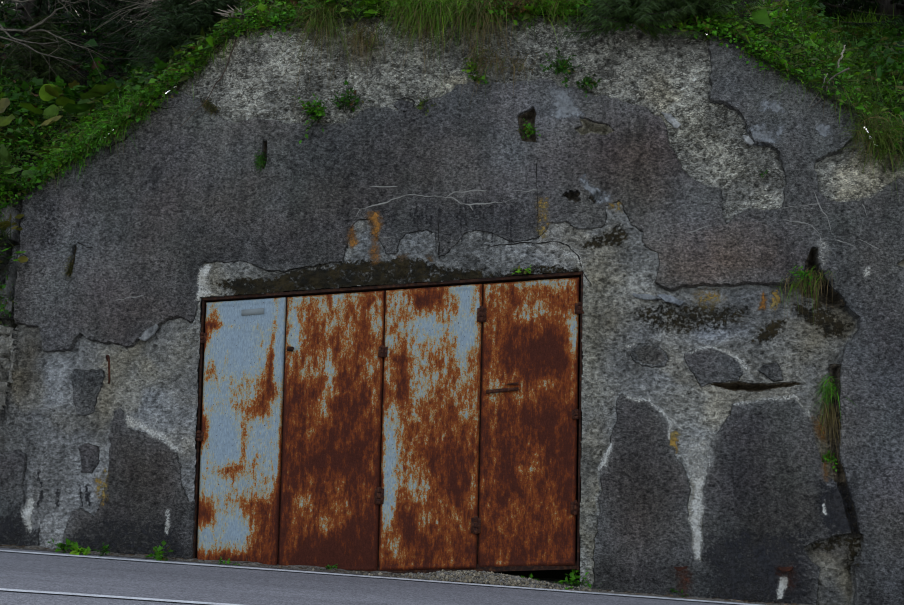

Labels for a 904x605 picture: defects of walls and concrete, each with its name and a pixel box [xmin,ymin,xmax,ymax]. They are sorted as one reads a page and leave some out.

flaking render [176,15,786,225]
water stain [125,415,180,452]
flaking render [0,175,862,605]
water stain [598,443,612,471]
water stain [627,396,672,439]
water stain [733,394,811,418]
water stain [69,510,183,557]
water stain [688,437,814,602]
water stain [818,482,857,534]